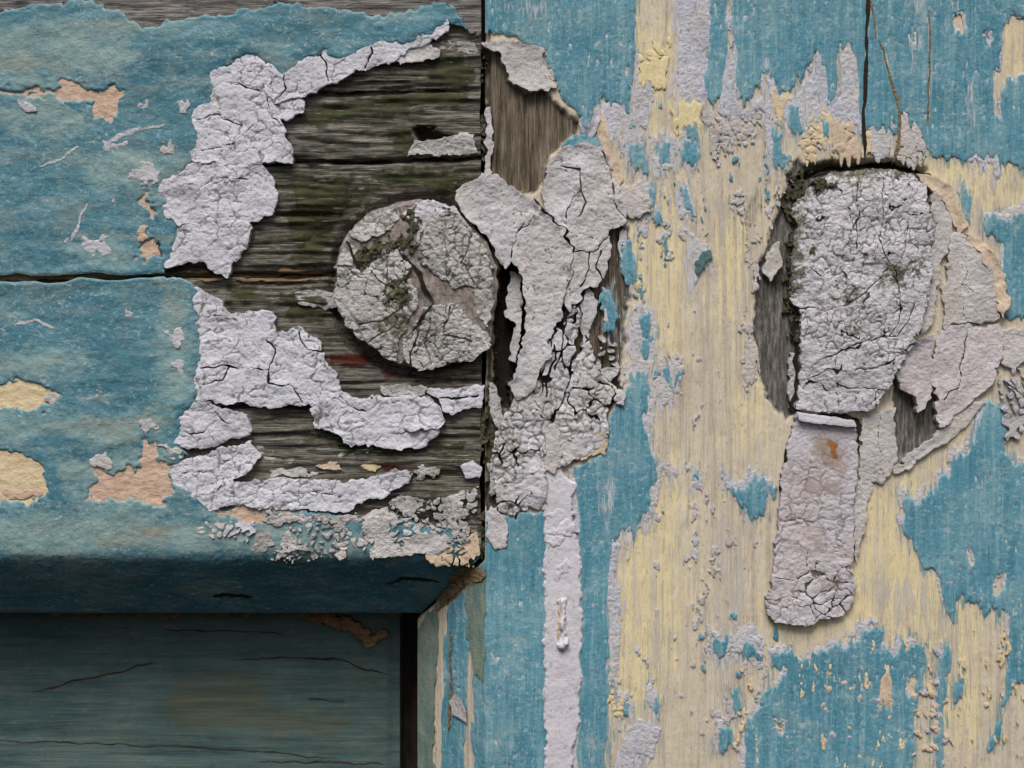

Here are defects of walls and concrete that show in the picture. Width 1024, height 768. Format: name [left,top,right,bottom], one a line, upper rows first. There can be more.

peeling [0,52,129,158]
peeling [128,19,479,279]
crack [482,38,557,93]
crack [803,0,931,180]
peeling [0,450,48,507]
peeling [0,377,61,414]
spalling [64,234,111,257]
peeling [67,264,526,567]
crack [266,87,652,549]
peeling [579,0,1024,768]